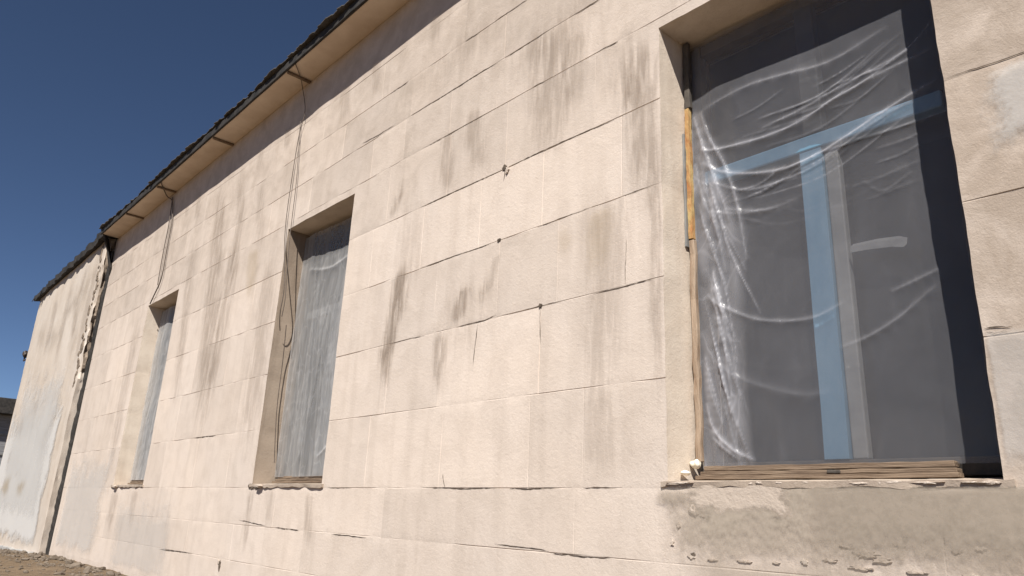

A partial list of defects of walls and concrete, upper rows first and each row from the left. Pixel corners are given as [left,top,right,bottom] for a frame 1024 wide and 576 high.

flaking render [663,480,1024,574]